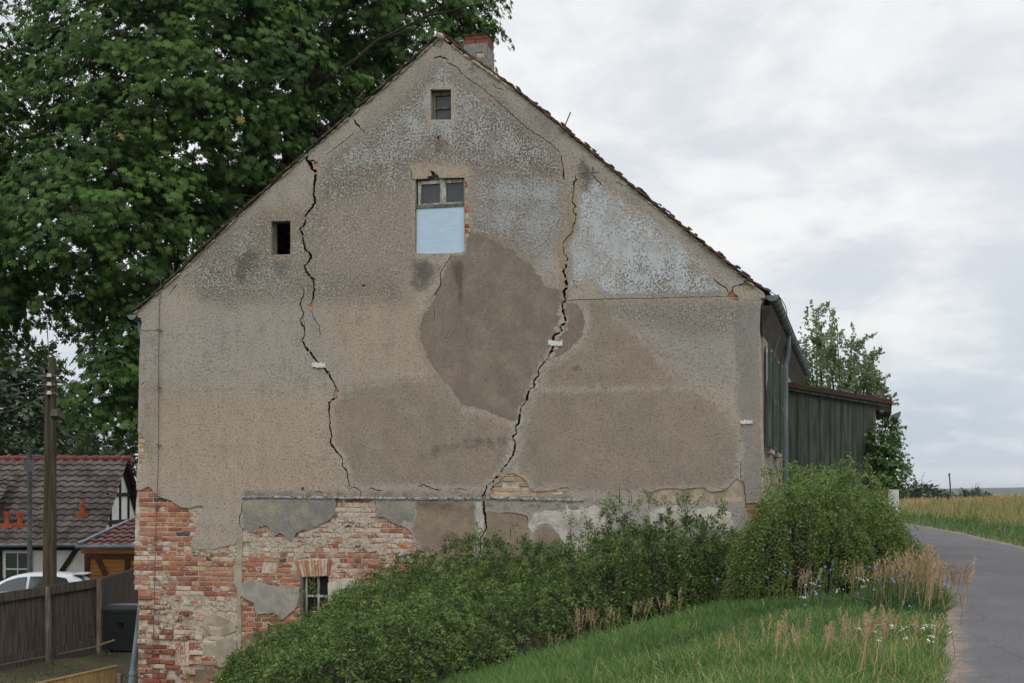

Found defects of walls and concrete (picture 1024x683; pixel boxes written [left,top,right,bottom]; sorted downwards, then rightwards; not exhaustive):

crack [295,119,383,492]
crack [417,43,742,559]
spalling [133,472,613,683]